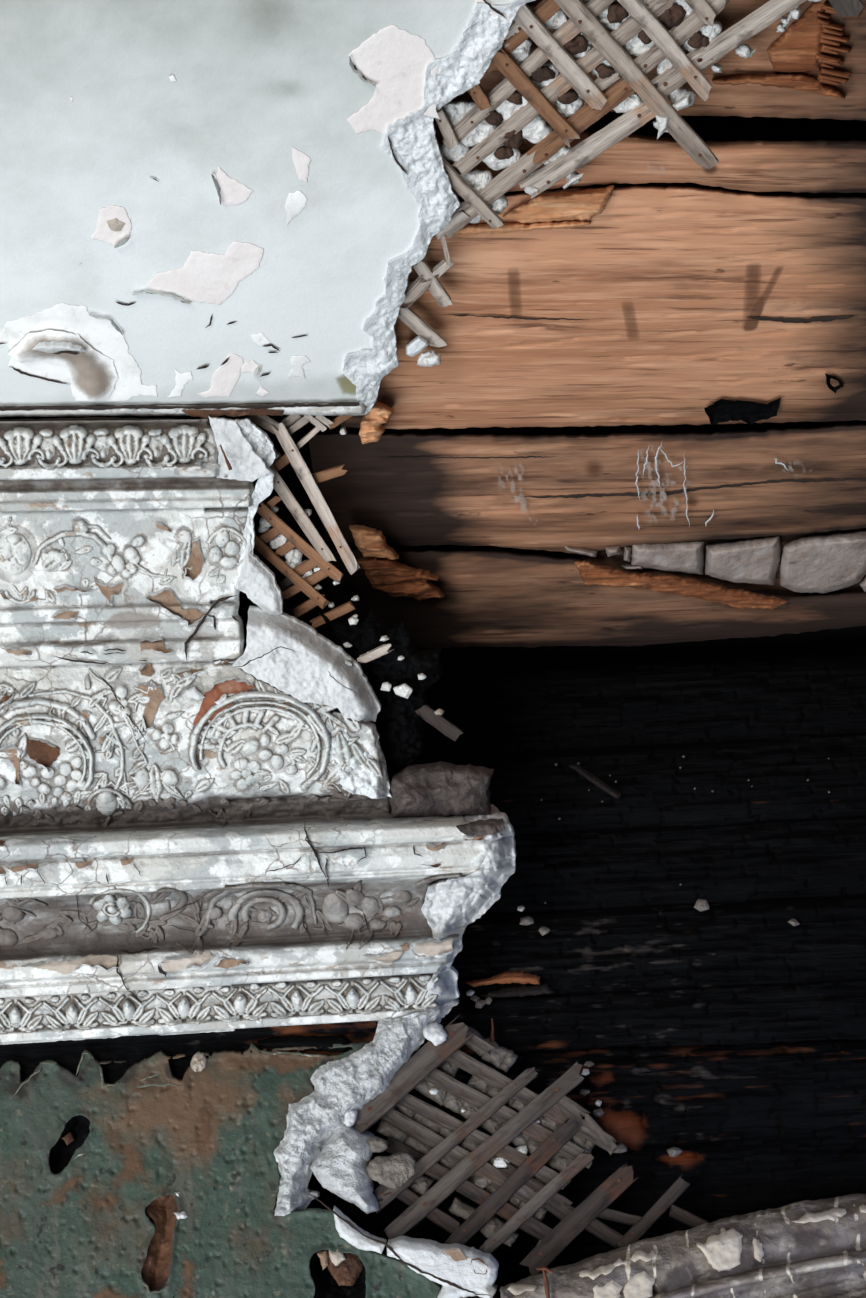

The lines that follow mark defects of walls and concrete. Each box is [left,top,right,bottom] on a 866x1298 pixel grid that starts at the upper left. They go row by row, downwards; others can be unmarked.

flaking render [656,94,691,139]
spalling [342,0,535,415]
flaking render [563,173,584,189]
peeling [116,241,264,306]
spalling [0,303,392,799]
crack [147,595,241,660]
crack [54,648,148,744]
crack [233,646,303,703]
crack [329,672,374,724]
spalling [273,804,517,1298]
hole [49,1115,90,1174]
hole [139,1192,188,1298]